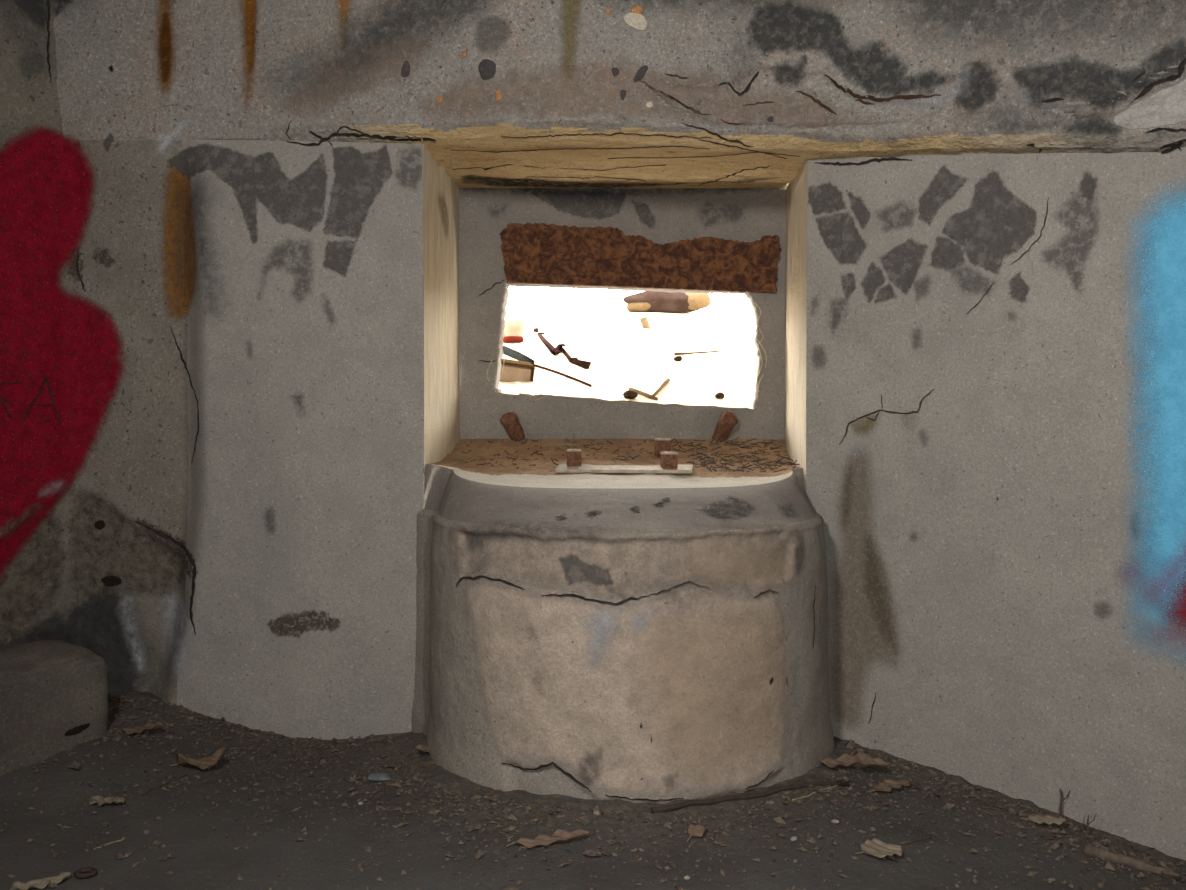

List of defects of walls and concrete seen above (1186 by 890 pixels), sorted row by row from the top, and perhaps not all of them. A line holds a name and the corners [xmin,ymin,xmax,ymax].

rust [158,0,173,90]
rust [243,0,255,87]
crack [1041,96,1064,104]
crack [1130,58,1186,103]
crack [285,71,941,186]
crack [1146,128,1186,154]
rust [165,169,196,316]
crack [170,326,199,463]
crack [839,389,934,444]
crack [456,575,708,606]
crack [501,762,684,802]